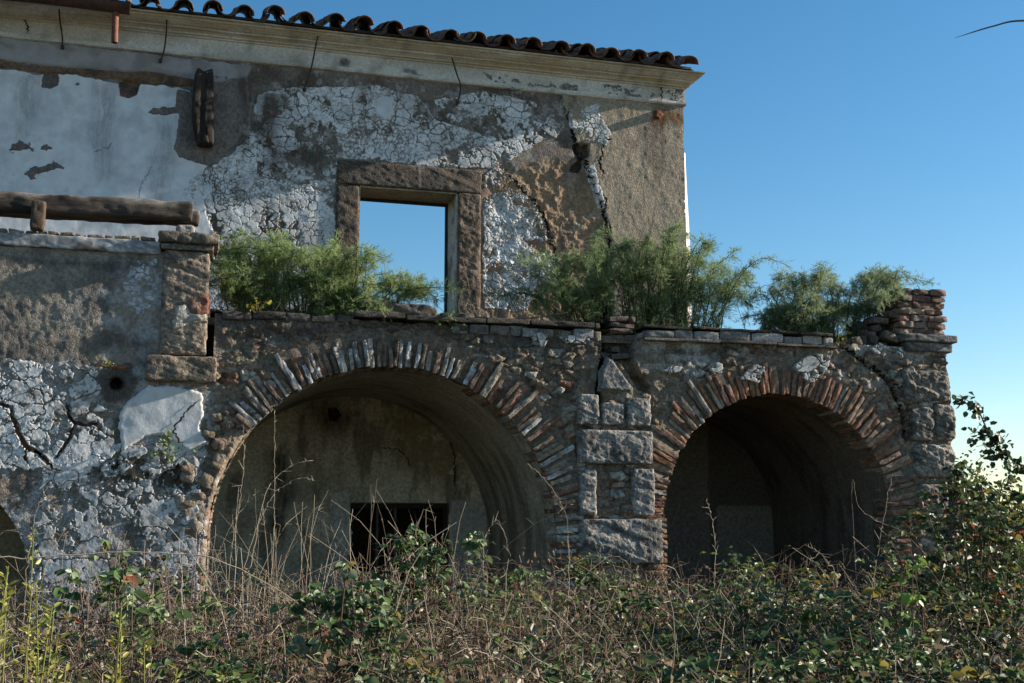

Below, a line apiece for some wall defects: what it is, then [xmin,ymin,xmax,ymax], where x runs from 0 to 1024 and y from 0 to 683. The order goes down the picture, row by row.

flaking render [603,84,684,101]
flaking render [0,59,611,316]
crack [505,169,557,260]
crack [563,106,613,257]
crack [0,402,100,472]
crack [172,399,200,449]
flaking render [0,358,208,641]